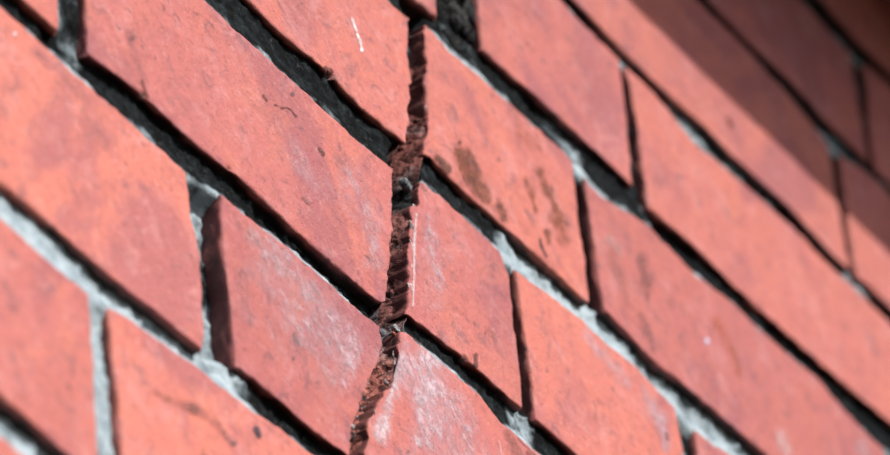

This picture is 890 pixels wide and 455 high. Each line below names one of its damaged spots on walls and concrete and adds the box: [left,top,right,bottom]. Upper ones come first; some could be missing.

crack [349,12,427,455]